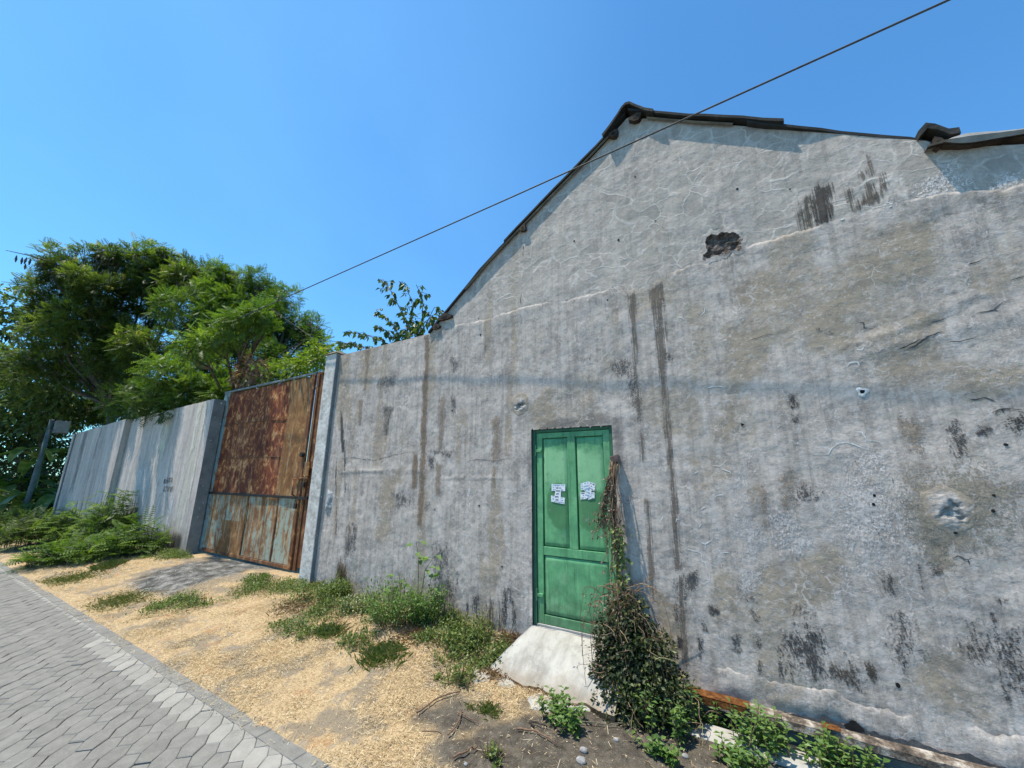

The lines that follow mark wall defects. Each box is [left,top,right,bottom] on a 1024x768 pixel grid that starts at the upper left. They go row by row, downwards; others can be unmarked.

flaking render [699,225,748,265]
water stain [797,155,1024,231]
water stain [612,293,644,460]
water stain [393,336,456,526]
water stain [644,498,656,602]
water stain [649,281,720,668]
flaking render [920,485,976,535]
mould [776,604,878,692]
mould [959,598,1024,705]